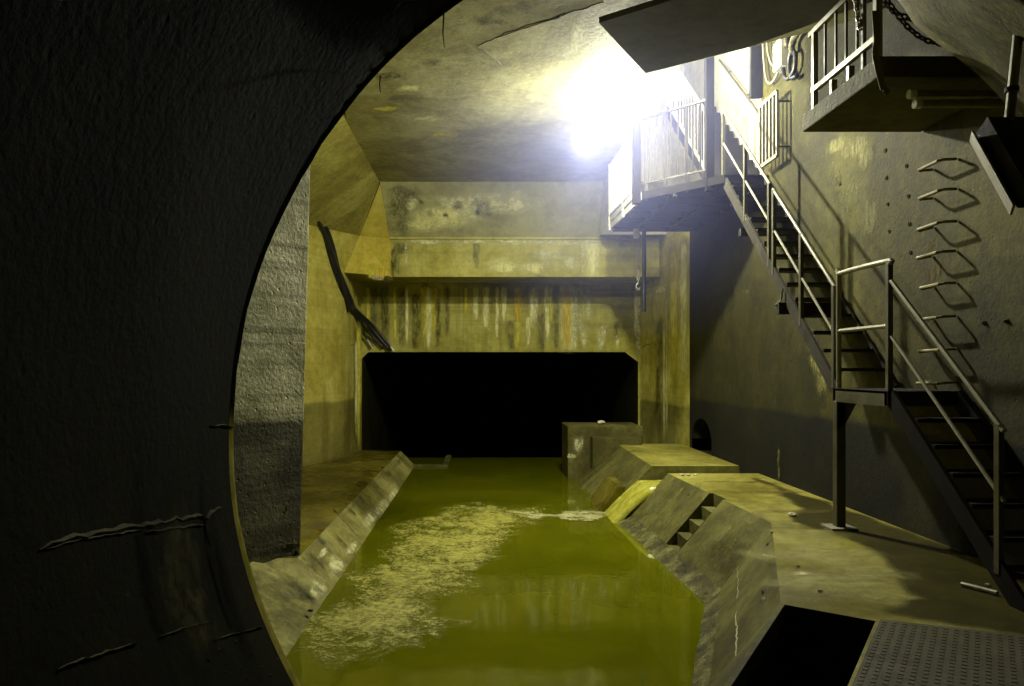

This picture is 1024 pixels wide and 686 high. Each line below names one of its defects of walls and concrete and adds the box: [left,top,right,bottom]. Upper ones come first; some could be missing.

crack [478,2,604,66]
damp [391,187,532,272]
damp [464,284,619,350]
crack [40,507,221,550]